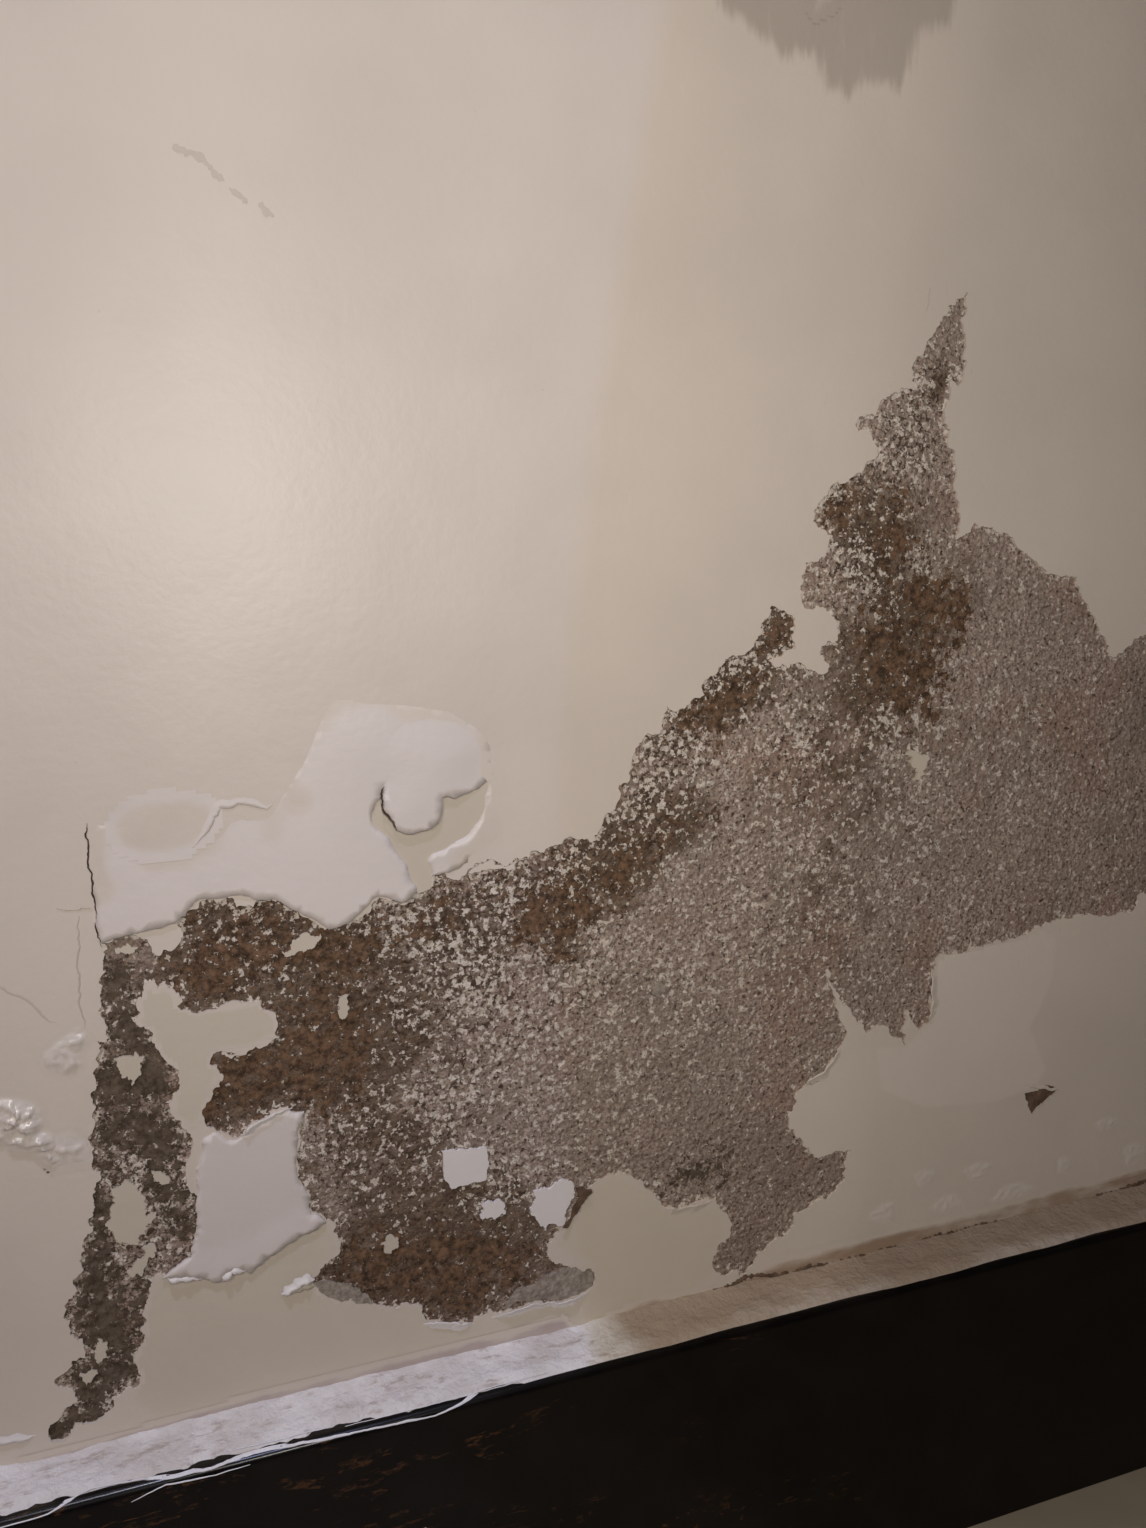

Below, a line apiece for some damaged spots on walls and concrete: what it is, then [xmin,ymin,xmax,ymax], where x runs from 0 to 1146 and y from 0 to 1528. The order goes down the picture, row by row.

leakage [705,0,970,112]
flaking render [48,296,1146,1440]